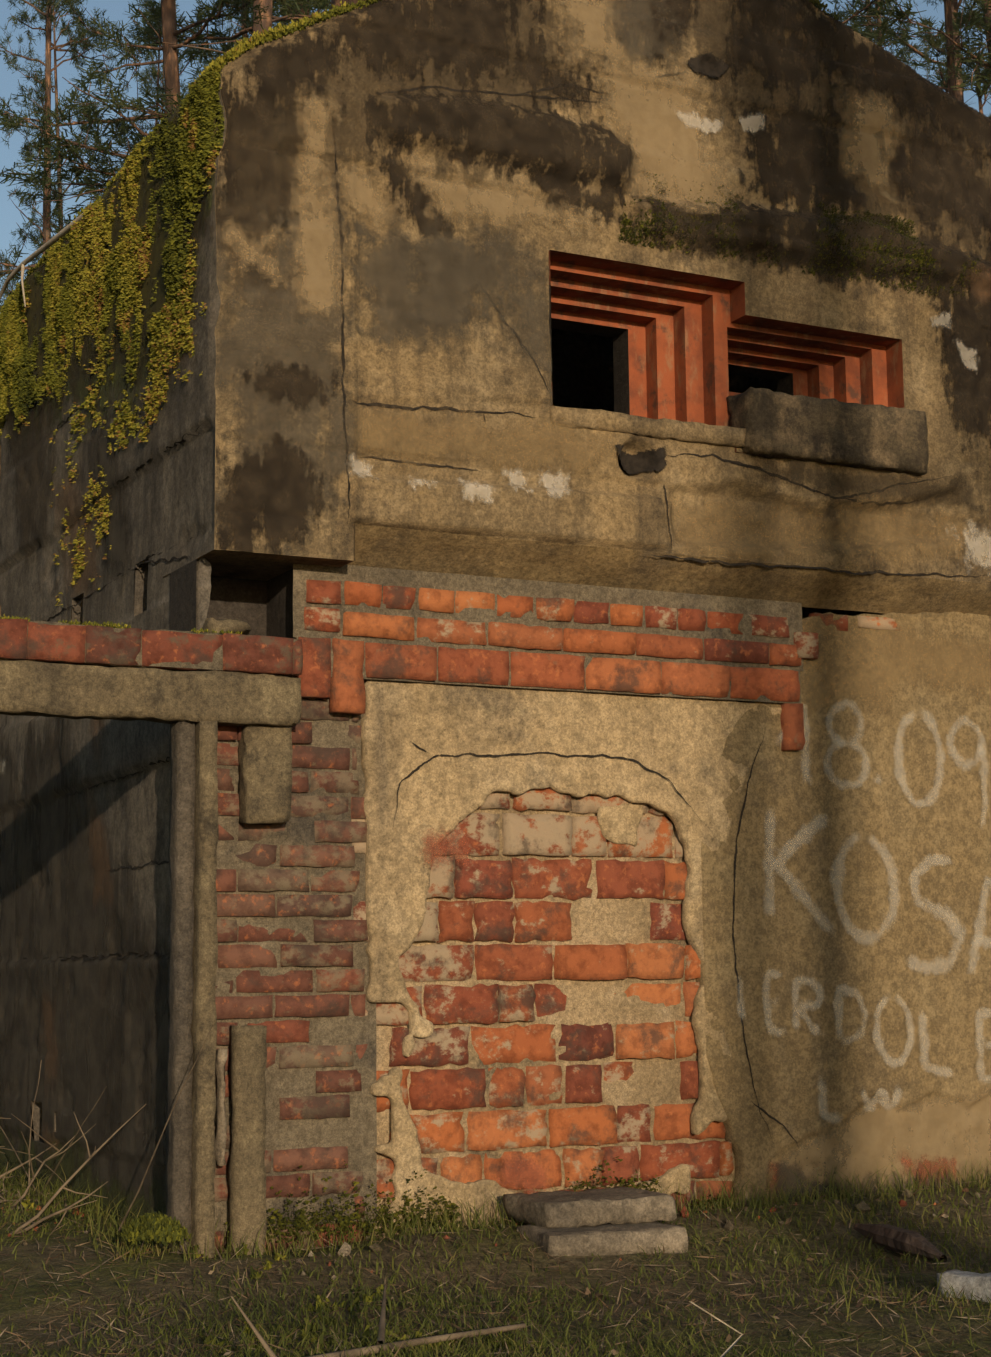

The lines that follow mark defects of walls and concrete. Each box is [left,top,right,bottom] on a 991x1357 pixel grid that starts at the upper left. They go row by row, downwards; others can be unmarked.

water stain [8,0,991,576]
crack [645,453,982,578]
crack [45,535,198,621]
crack [104,860,169,872]
crack [393,741,699,826]
peeling [597,803,644,846]
crack [6,951,169,963]
crack [732,727,800,1148]
peeling [784,1088,991,1192]